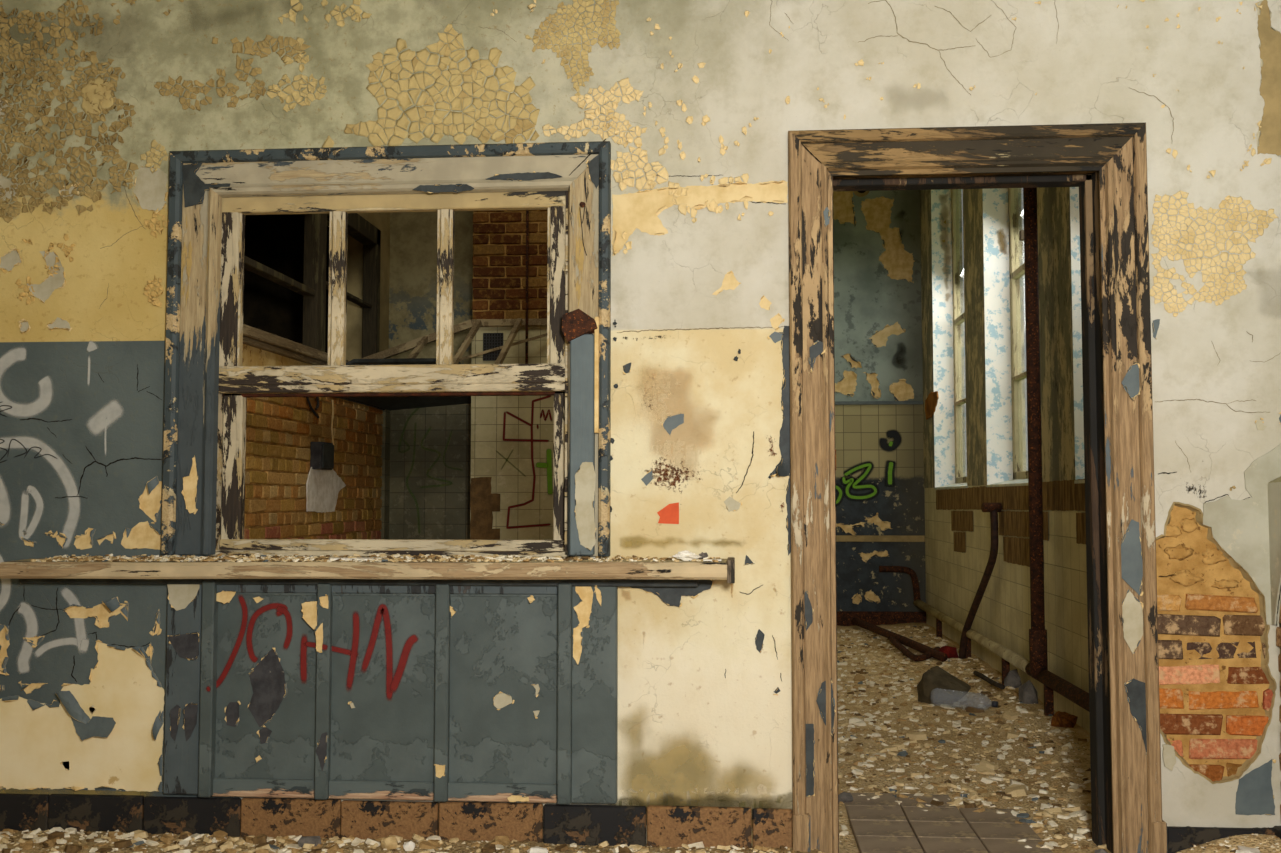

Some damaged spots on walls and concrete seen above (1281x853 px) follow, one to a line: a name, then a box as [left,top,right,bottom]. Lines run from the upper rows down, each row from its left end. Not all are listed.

peeling [0,0,230,238]
peeling [154,0,327,112]
peeling [321,0,788,256]
crack [859,0,1016,95]
crack [1130,88,1174,139]
flaking render [1236,0,1281,171]
peeling [823,191,915,284]
peeling [1150,190,1279,317]
peeling [0,584,200,792]
peeling [216,591,236,604]
flaking render [1118,502,1277,784]
water stain [609,743,793,845]